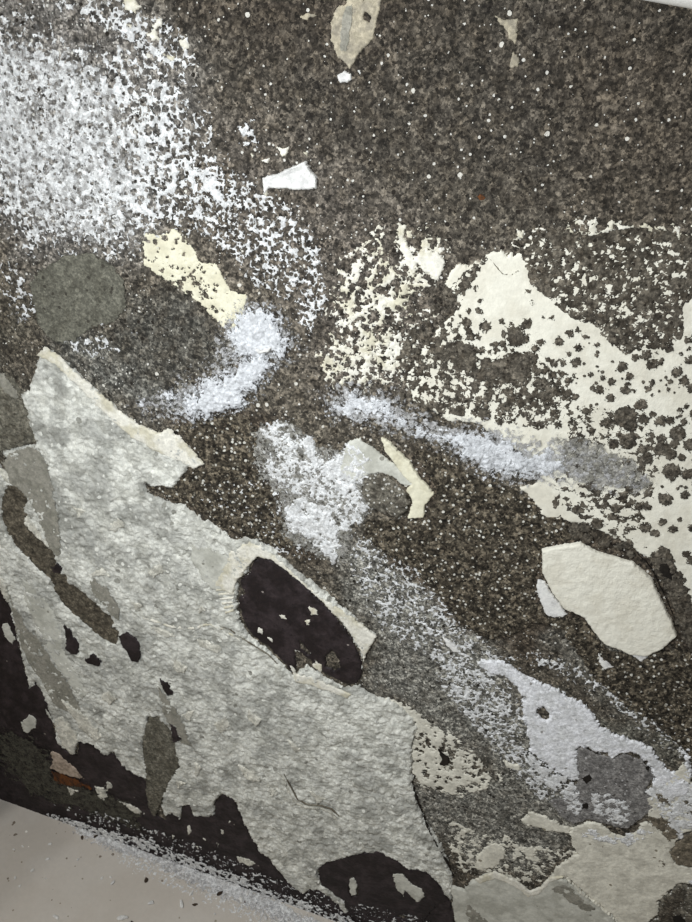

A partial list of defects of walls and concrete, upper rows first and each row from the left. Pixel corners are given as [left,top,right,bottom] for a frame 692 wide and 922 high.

leakage [0,0,329,336]
peeling [330,0,381,83]
leakage [65,323,120,359]
flaking render [0,347,692,922]
leakage [138,226,692,839]
peeling [315,215,692,662]
leakage [0,727,427,922]
leakage [581,823,653,847]